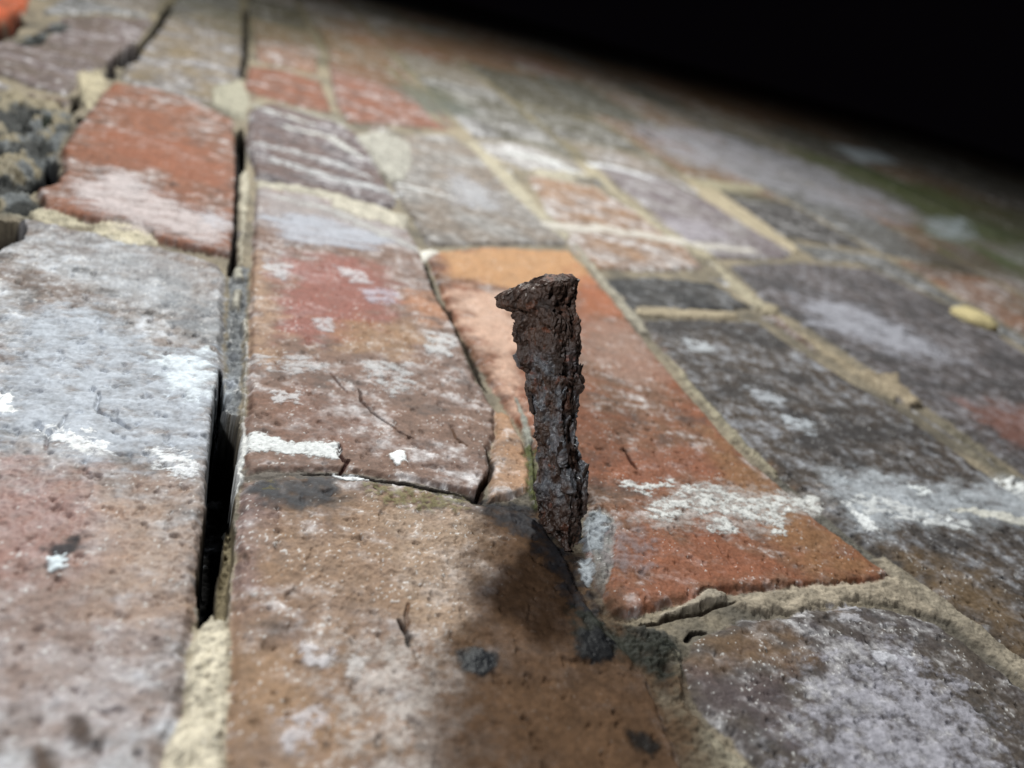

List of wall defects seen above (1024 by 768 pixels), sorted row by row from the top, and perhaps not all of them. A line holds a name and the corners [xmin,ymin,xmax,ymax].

water stain [0,305,236,477]
crack [330,373,414,439]
rust [524,387,535,414]
crack [300,427,495,505]
water stain [619,479,824,536]
water stain [832,471,1024,532]
water stain [301,645,331,666]
water stain [338,501,696,768]
water stain [281,708,323,749]